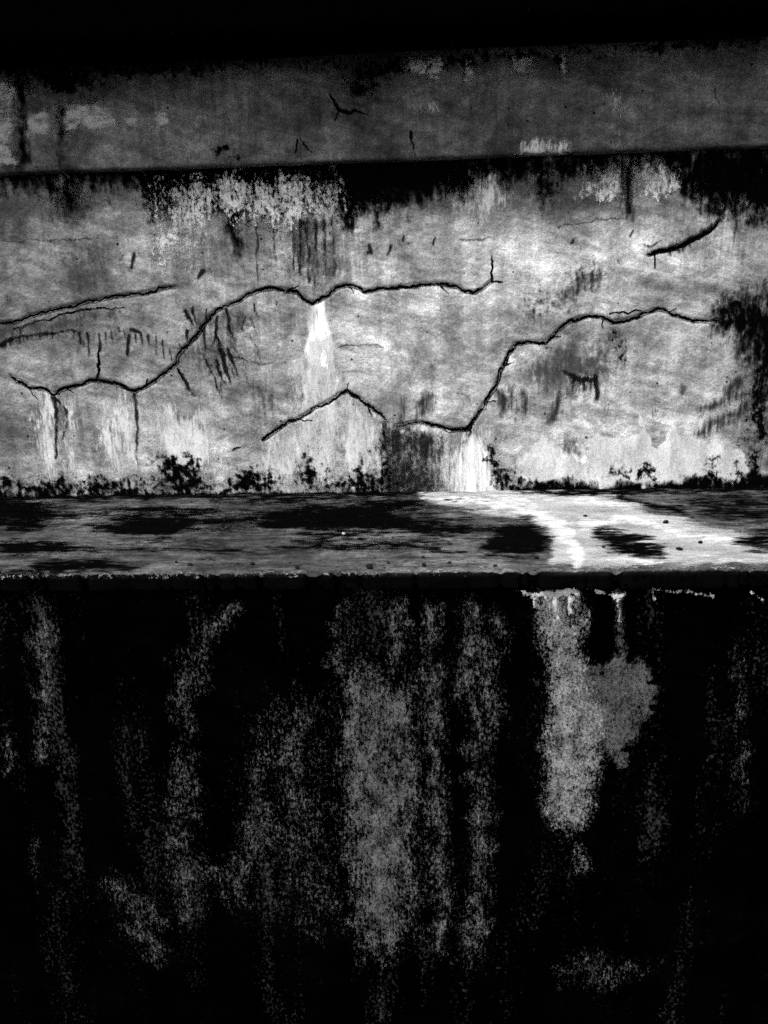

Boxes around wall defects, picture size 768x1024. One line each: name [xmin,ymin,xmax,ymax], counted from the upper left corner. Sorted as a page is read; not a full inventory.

leakage [0,37,768,285]
crack [0,236,503,400]
leakage [0,283,768,579]
crack [232,307,717,451]
efflorescence [31,609,59,763]
efflorescence [165,711,326,921]
efflorescence [322,601,507,966]
efflorescence [521,587,657,835]
efflorescence [105,879,168,966]